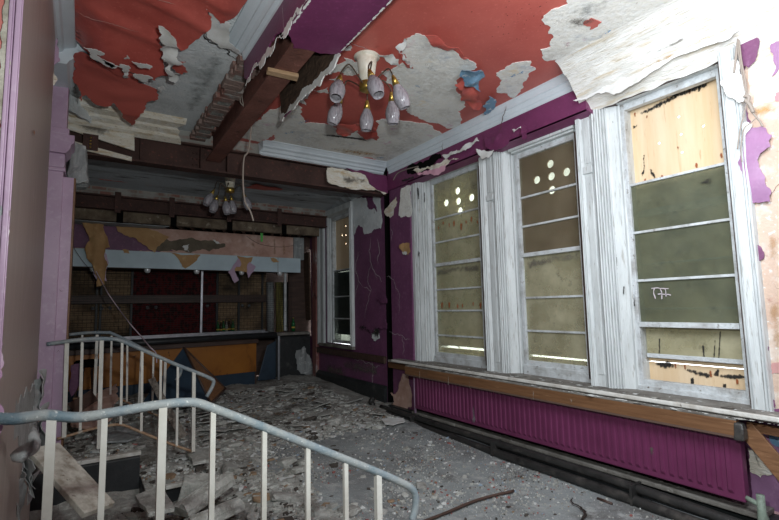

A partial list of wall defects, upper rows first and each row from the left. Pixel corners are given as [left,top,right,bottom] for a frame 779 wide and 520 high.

flaking render [0,0,11,138]
peeling [72,0,247,125]
peeling [242,0,536,162]
flaking render [393,124,528,180]
flaking render [351,185,412,235]
flaking render [541,0,779,412]
peeling [82,220,110,287]
peeling [228,256,256,283]
peeling [15,369,50,412]
flaking render [391,374,412,409]
peeling [10,422,46,520]
crack [570,497,613,520]